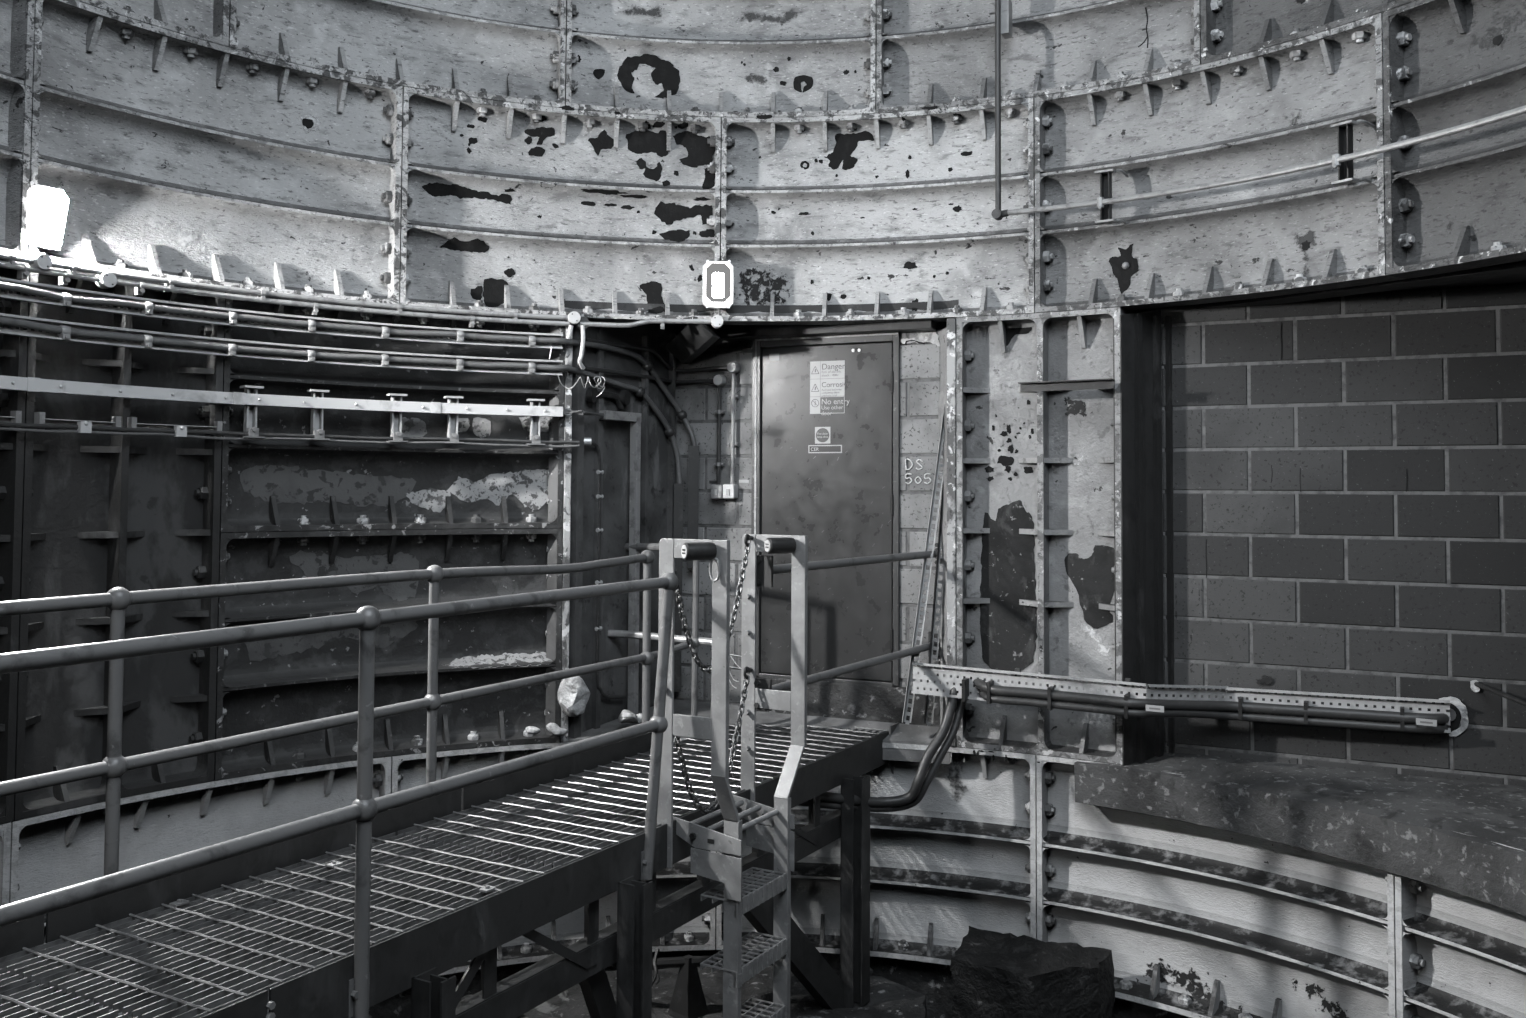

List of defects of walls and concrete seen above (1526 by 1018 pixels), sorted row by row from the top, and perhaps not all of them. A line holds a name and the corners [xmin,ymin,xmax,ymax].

peeling [578,54,680,99]
peeling [460,117,488,154]
peeling [524,105,575,157]
peeling [581,118,716,242]
peeling [800,128,874,177]
peeling [985,400,1034,481]
peeling [980,500,1038,671]
peeling [1064,545,1115,629]